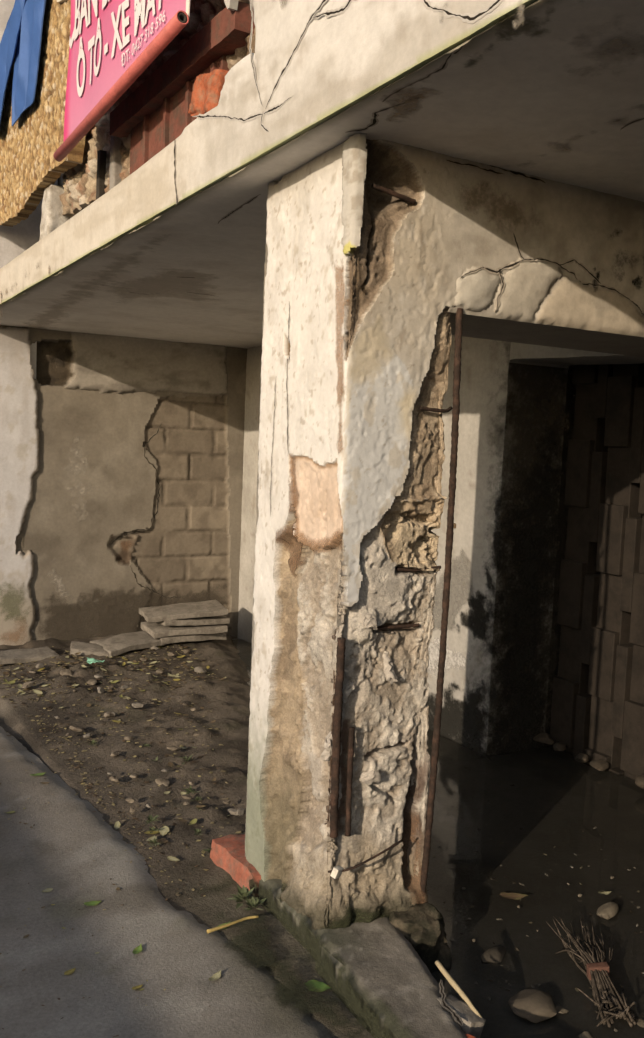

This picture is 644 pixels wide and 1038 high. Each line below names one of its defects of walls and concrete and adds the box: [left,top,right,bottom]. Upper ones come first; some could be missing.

crack [192,0,356,133]
crack [345,0,503,133]
crack [172,139,180,205]
crack [460,232,644,315]
hole [30,338,77,387]
spalling [107,533,139,566]
spalling [259,305,462,930]
damp [427,344,576,760]